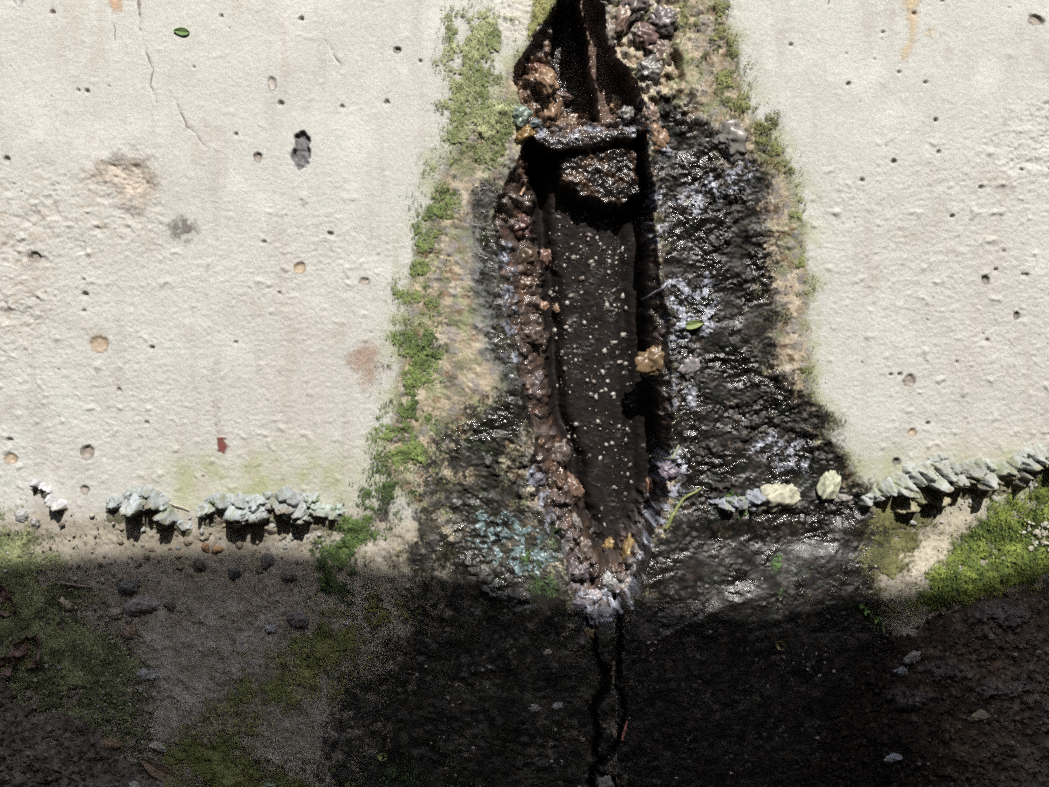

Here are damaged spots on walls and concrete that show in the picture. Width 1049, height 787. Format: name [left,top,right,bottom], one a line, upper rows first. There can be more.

leakage [304,86,899,787]
crack [582,592,628,787]
spalling [385,0,865,642]